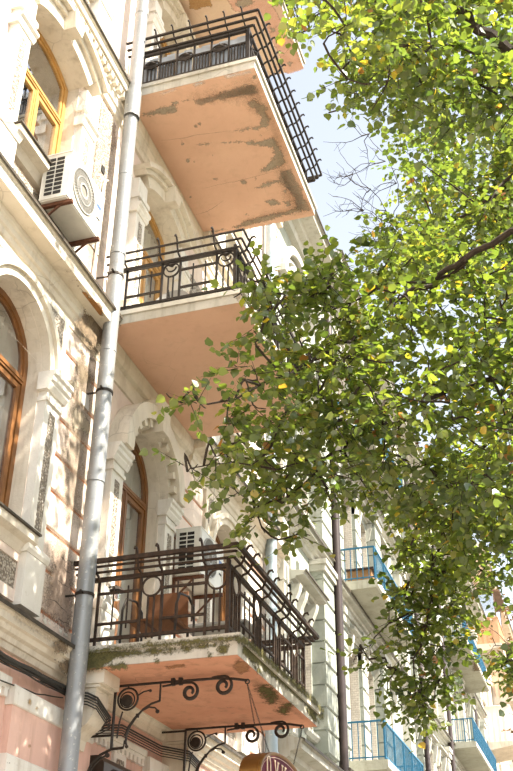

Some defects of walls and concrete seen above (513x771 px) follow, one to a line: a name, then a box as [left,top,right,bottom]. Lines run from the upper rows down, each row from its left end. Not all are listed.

peeling [142,75,309,232]
water stain [62,345,101,519]
water stain [87,635,324,724]